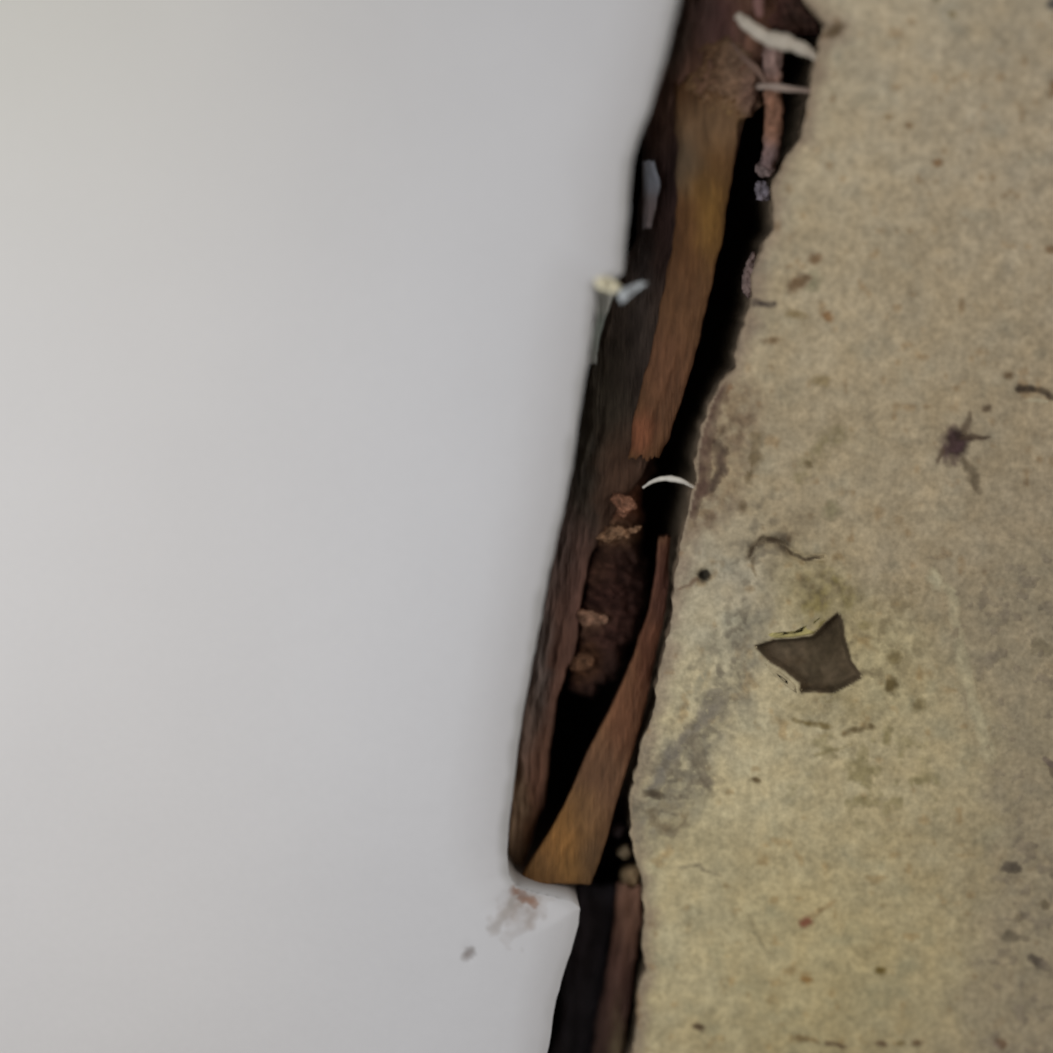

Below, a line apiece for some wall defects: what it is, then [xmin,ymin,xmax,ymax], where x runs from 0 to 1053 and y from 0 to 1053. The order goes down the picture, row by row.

peeling [595,277,648,304]
spalling [751,252,837,324]
spalling [683,373,770,546]
crack [747,498,829,578]
spalling [639,745,725,840]
spalling [747,775,762,785]
peeling [754,505,1053,1053]
crack [677,861,722,877]
crack [743,911,776,961]
spalling [690,1020,707,1034]